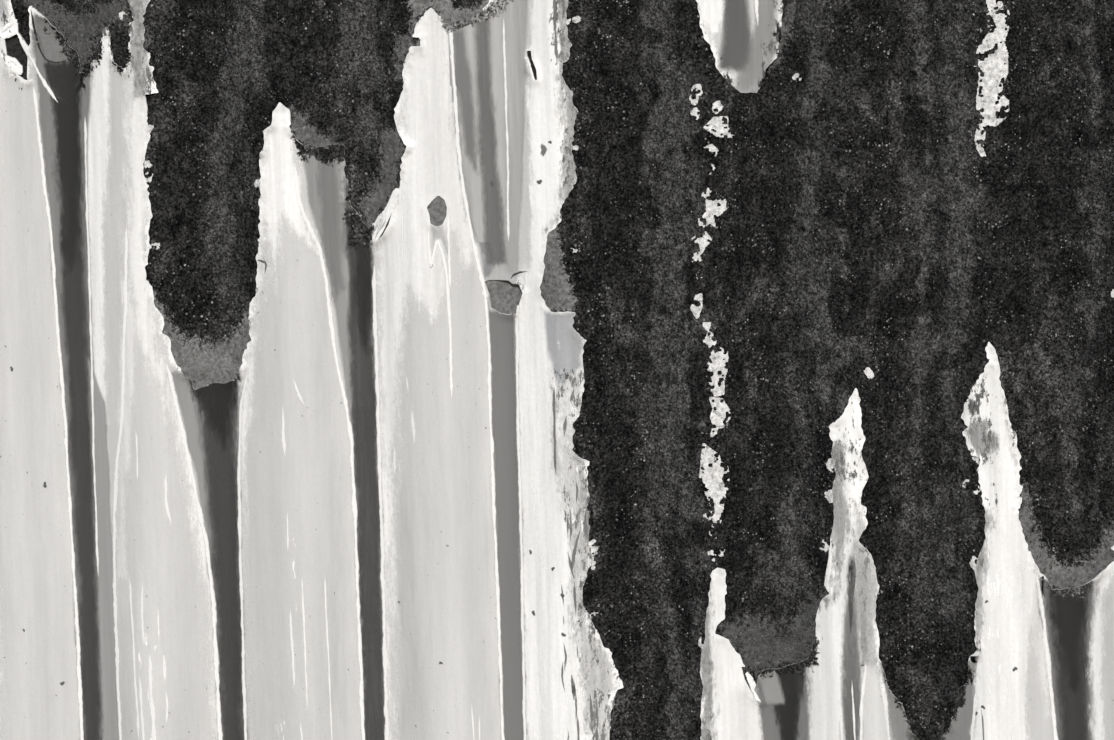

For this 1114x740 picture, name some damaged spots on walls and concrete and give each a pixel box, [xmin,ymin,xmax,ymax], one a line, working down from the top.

peeling [0,11,27,80]
peeling [128,0,154,97]
peeling [541,0,578,196]
peeling [427,196,447,227]
corrosion [11,0,527,740]
peeling [485,280,522,314]
corrosion [540,0,1114,740]
peeling [967,377,1000,532]
peeling [549,368,611,740]
peeling [700,609,714,740]
peeling [824,418,877,658]
peeling [975,547,988,652]